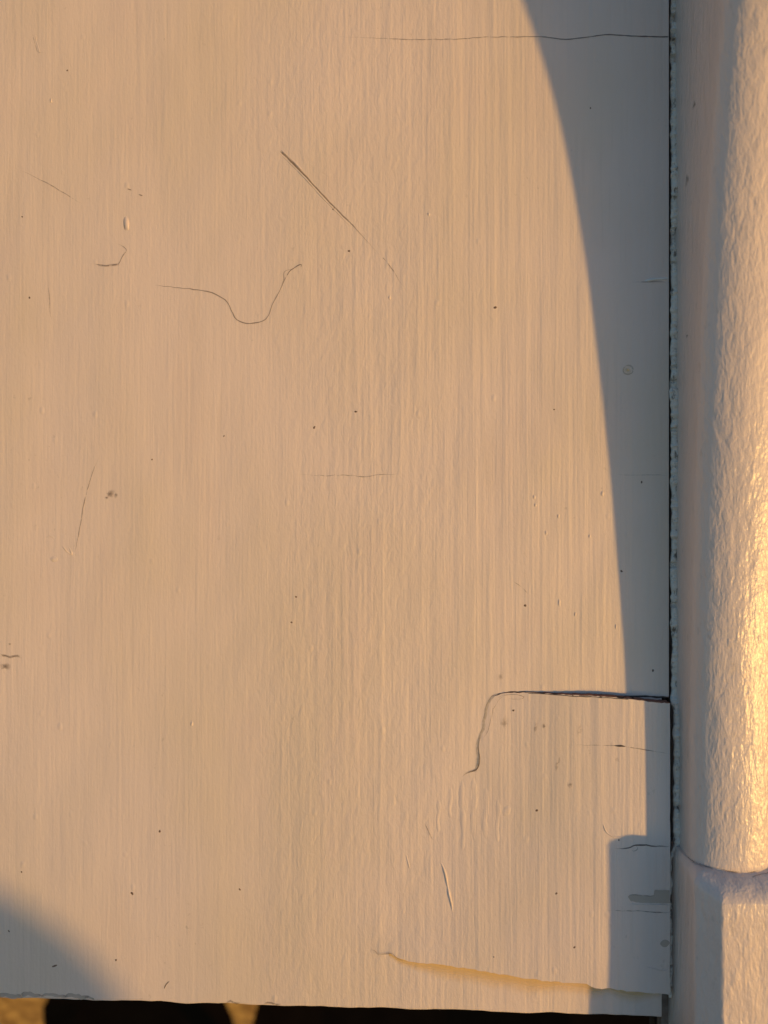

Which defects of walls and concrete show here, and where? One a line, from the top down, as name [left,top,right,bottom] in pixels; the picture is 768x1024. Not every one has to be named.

crack [526,33,668,41]